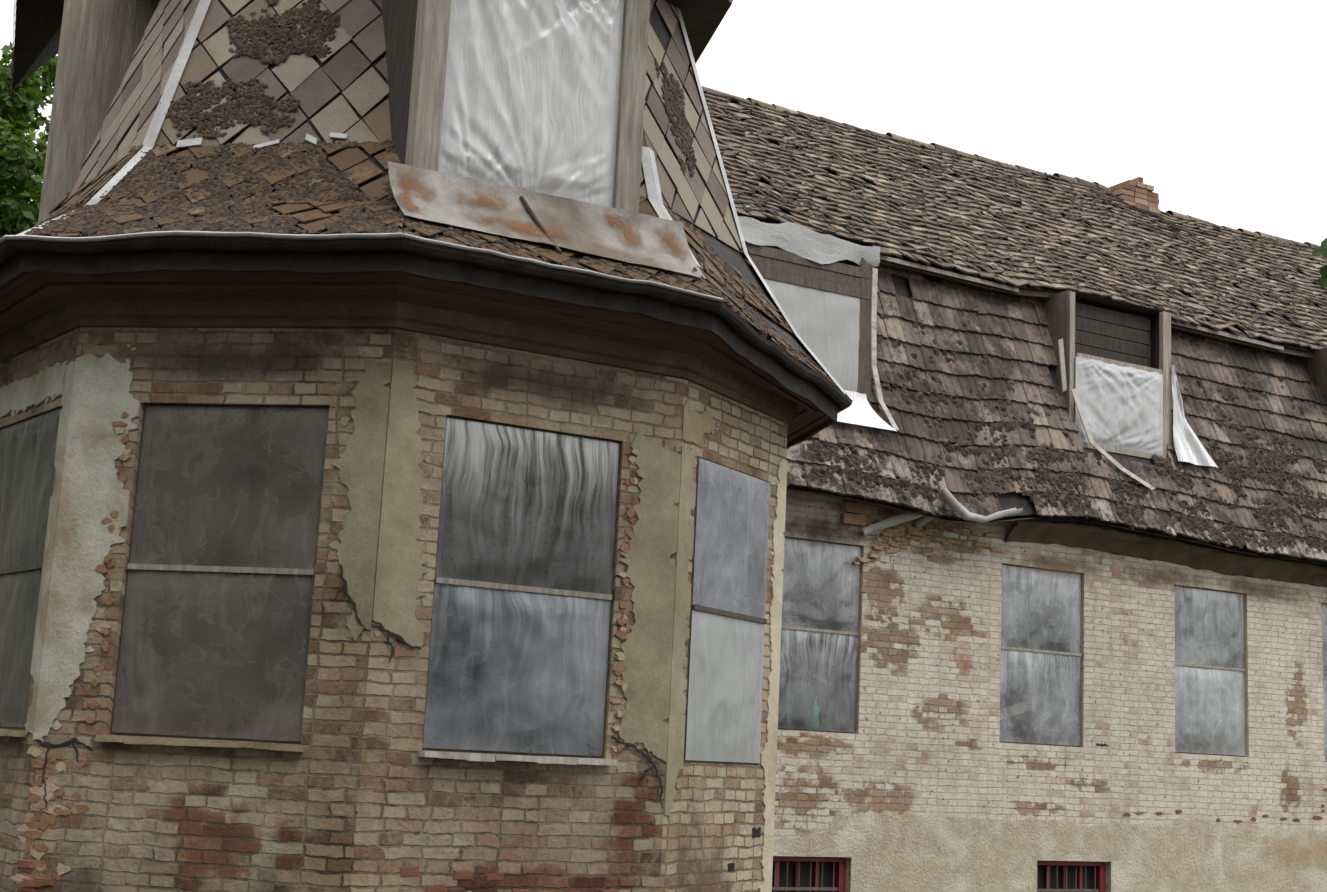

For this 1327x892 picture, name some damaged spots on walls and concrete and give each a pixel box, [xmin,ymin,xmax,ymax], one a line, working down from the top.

corrosion [399,177,432,209]
corrosion [469,195,564,236]
corrosion [608,215,641,245]
corrosion [661,232,682,256]
peeling [328,348,430,646]
spalling [852,510,1004,669]
peeling [0,344,140,892]
peeling [1286,663,1307,740]
spalling [400,866,637,892]